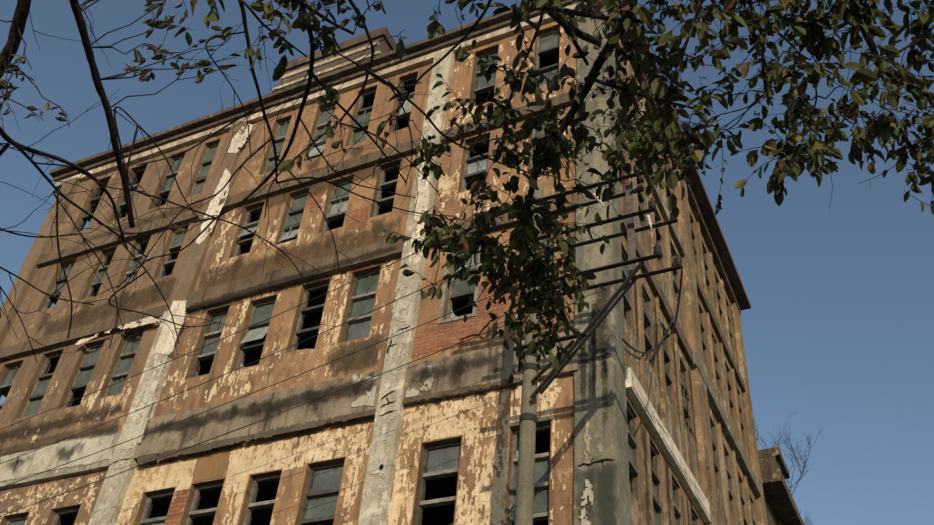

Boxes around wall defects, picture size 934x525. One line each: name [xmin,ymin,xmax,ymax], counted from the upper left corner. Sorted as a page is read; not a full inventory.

peeling [228,124,253,153]
peeling [423,81,487,151]
peeling [196,169,327,271]
peeling [409,162,482,265]
damp [0,404,120,469]
damp [143,379,373,436]
peeling [0,259,524,525]
damp [329,336,381,374]
damp [413,356,496,381]
peeling [537,378,571,490]
damp [580,288,608,405]
peeling [579,479,594,525]